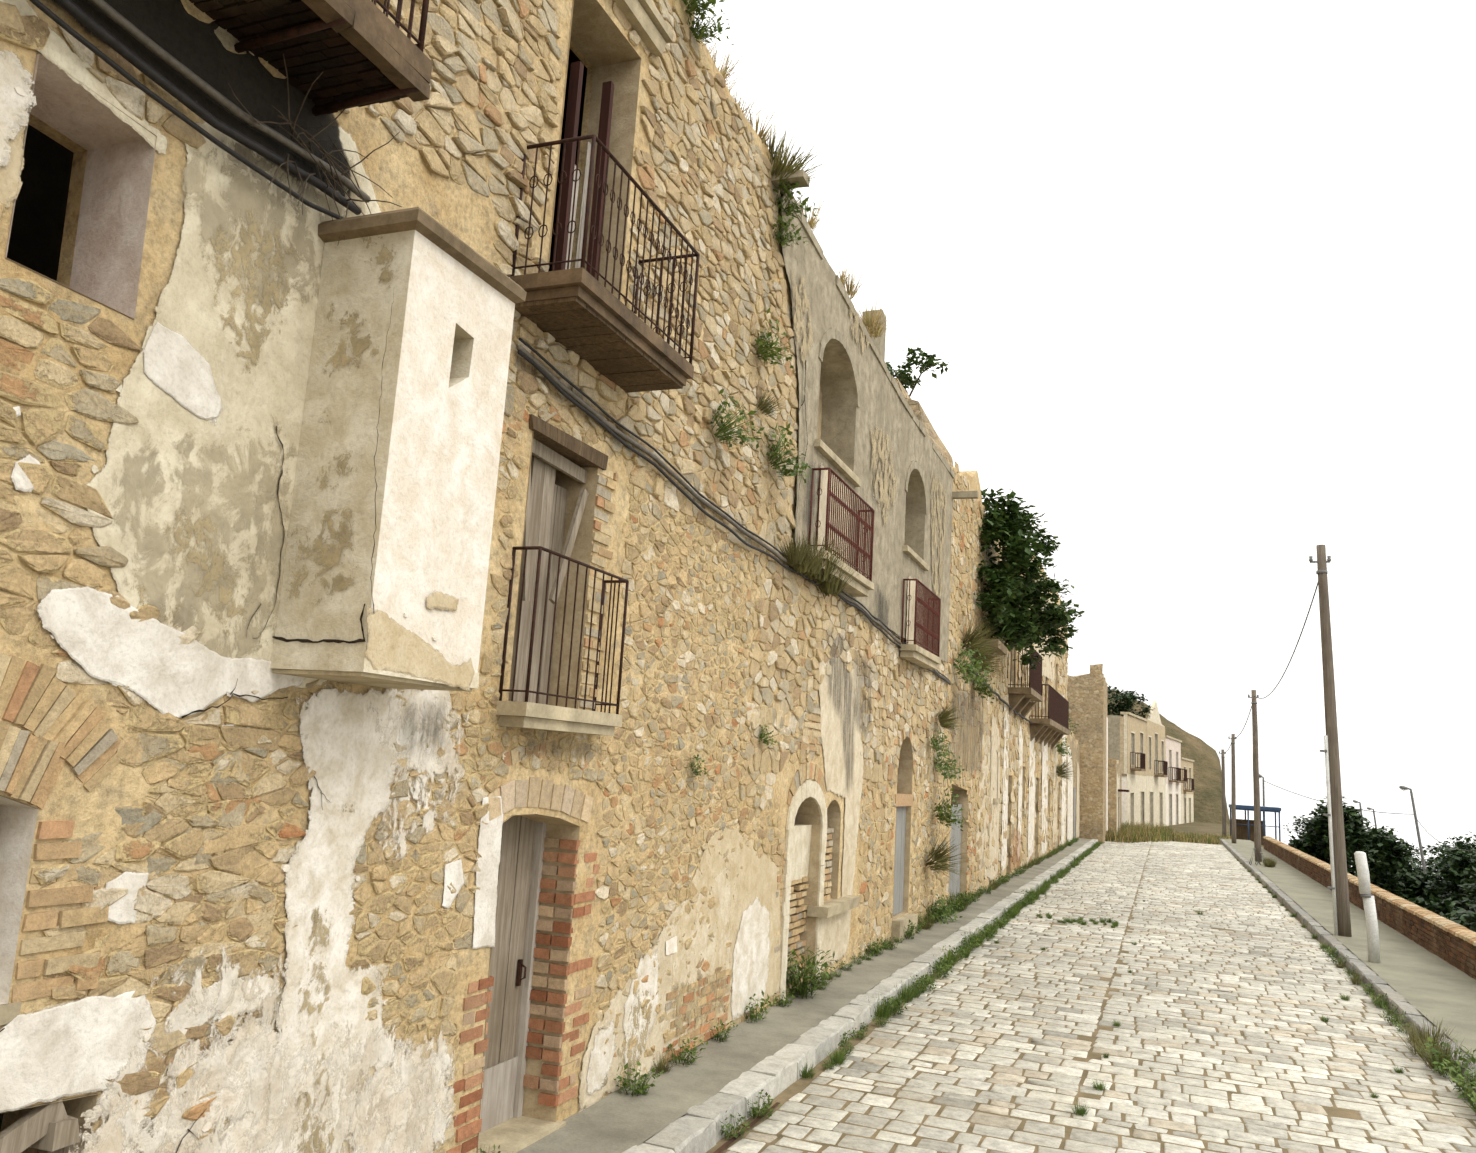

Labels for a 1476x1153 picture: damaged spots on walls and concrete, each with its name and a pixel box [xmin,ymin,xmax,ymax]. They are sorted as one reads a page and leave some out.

flaking render [0,0,167,155]
crack [246,294,394,644]
crack [181,679,288,718]
flaking render [0,122,475,1153]
flaking render [473,796,504,949]
crack [176,1108,207,1153]